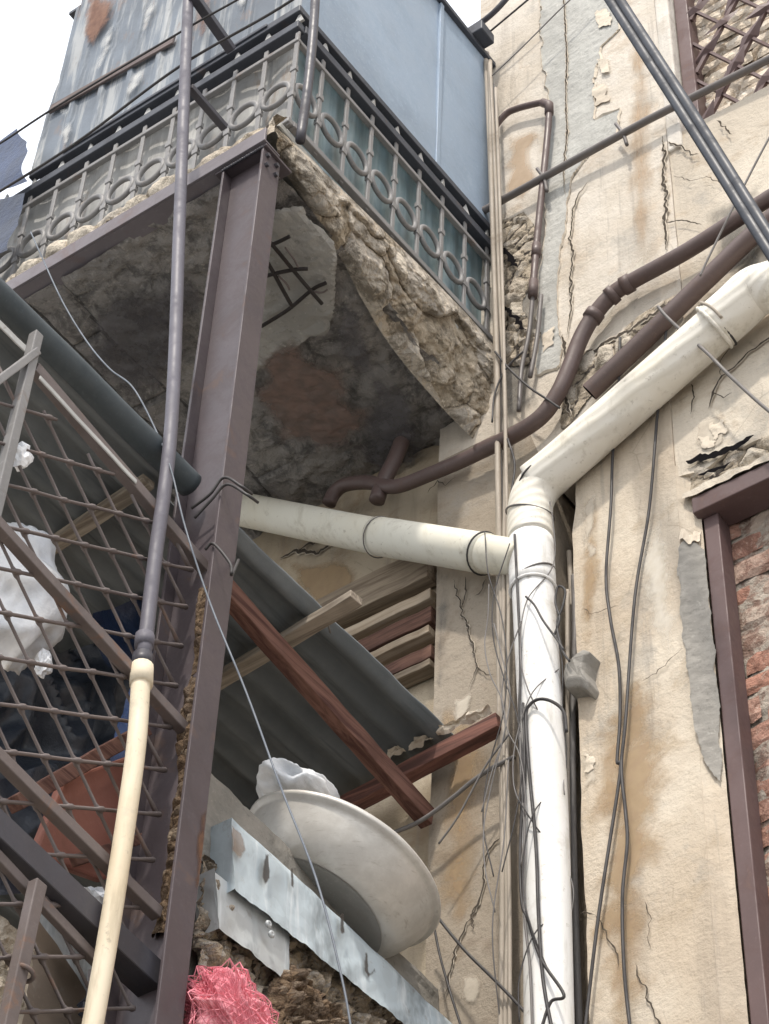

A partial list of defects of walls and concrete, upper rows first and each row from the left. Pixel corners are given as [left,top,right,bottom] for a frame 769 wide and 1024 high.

spalling [262,235,328,328]